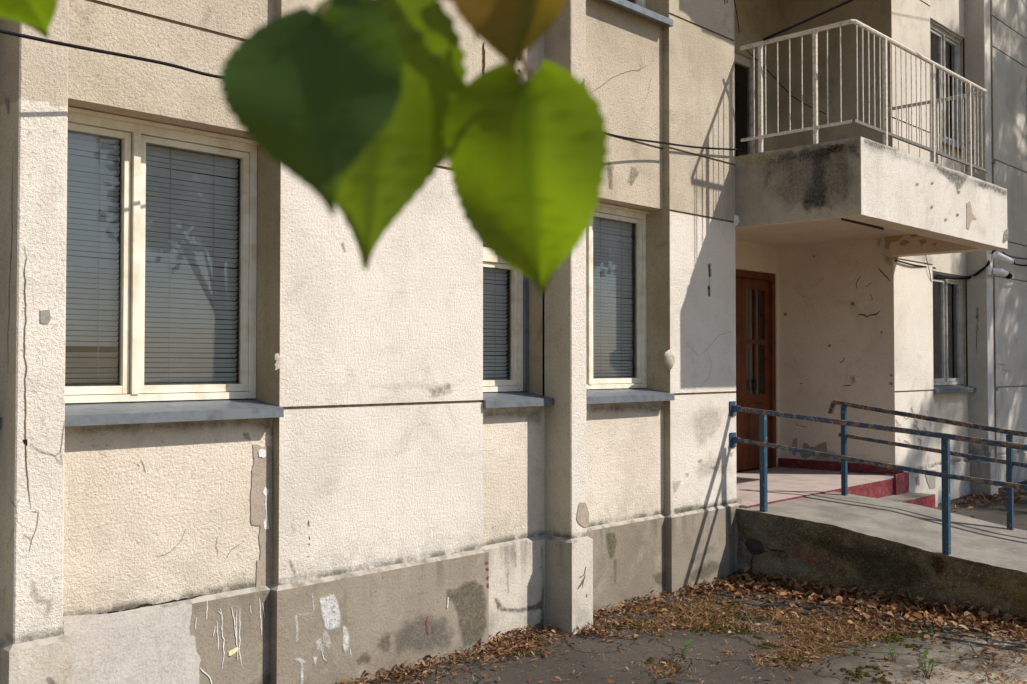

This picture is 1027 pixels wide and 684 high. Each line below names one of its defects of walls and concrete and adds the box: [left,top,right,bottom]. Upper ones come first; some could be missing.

damp [743,145,855,207]
flaking render [884,234,936,249]
crack [6,201,65,553]
peeling [244,434,273,587]
damp [448,582,485,644]